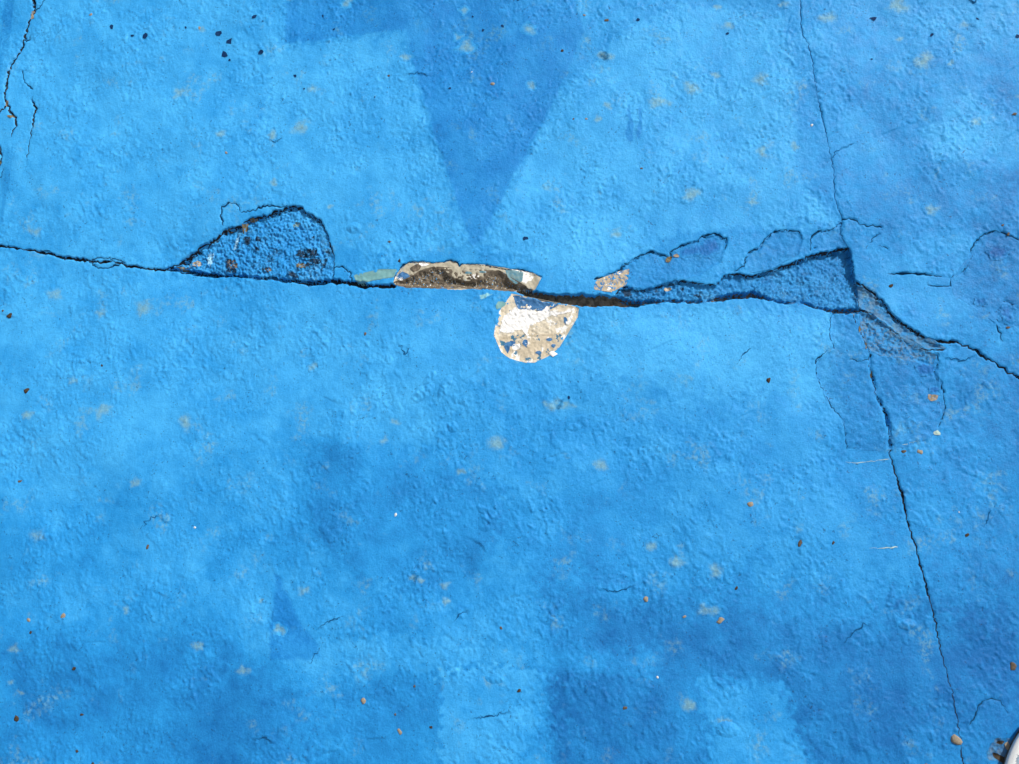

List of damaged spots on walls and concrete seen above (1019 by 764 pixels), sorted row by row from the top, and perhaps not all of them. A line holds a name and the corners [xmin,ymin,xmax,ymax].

crack [0,0,44,178]
crack [0,245,396,289]
flaking render [168,202,579,363]
peeling [594,218,946,451]
crack [521,1,1019,764]